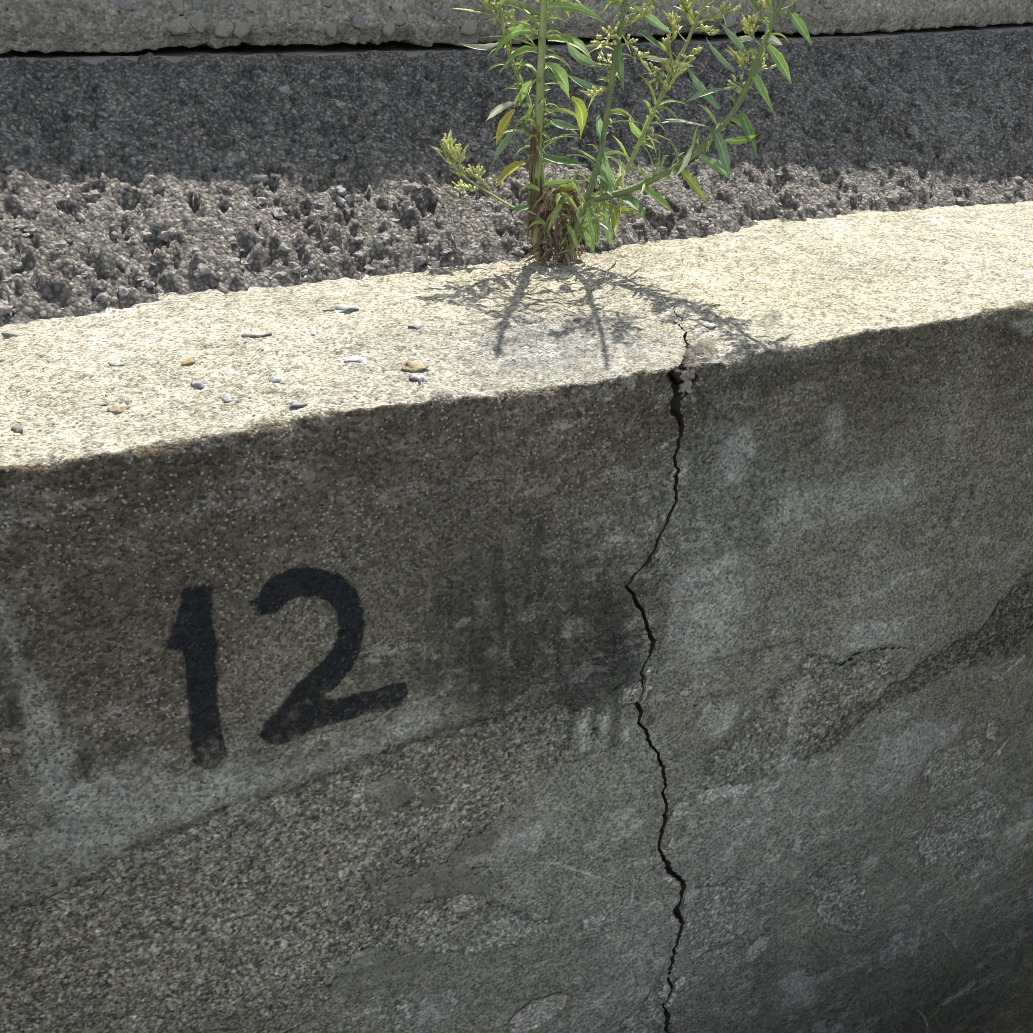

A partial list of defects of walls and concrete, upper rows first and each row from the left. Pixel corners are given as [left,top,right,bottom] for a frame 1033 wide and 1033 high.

crack [587,259,723,1033]
crack [826,647,907,667]
damp [570,704,630,753]